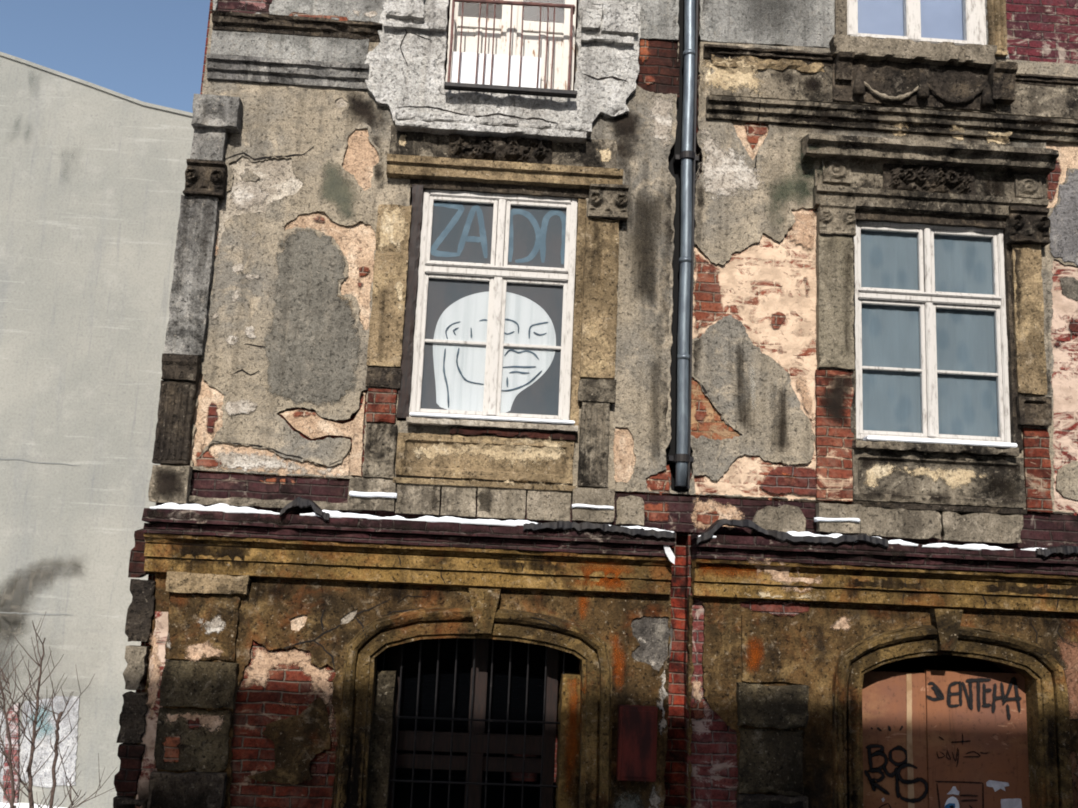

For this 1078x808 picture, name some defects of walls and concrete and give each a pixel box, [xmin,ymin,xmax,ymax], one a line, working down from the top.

crack [224,146,314,160]
crack [399,18,432,66]
crack [403,106,557,124]
crack [585,73,626,81]
flaking render [636,35,681,147]
peeling [696,121,769,200]
flaking render [1046,142,1078,208]
flaking render [285,207,407,330]
flaking render [691,208,823,530]
flaking render [1051,260,1078,515]
flaking render [186,616,225,660]
flaking render [163,640,337,808]